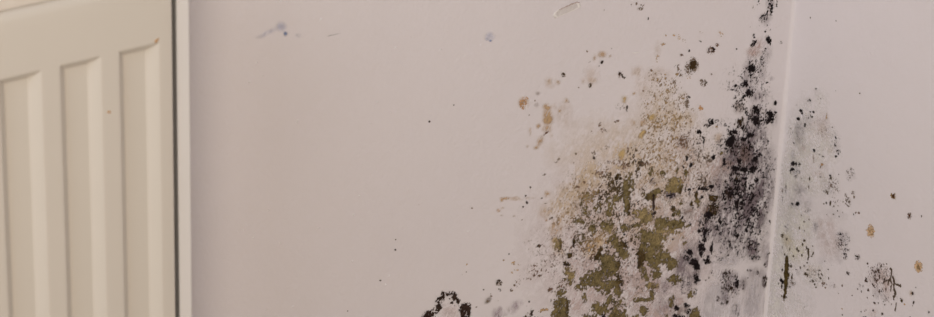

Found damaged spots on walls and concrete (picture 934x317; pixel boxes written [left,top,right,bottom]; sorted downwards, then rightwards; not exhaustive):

damp [423,0,829,317]
damp [789,145,860,215]
damp [838,233,916,317]